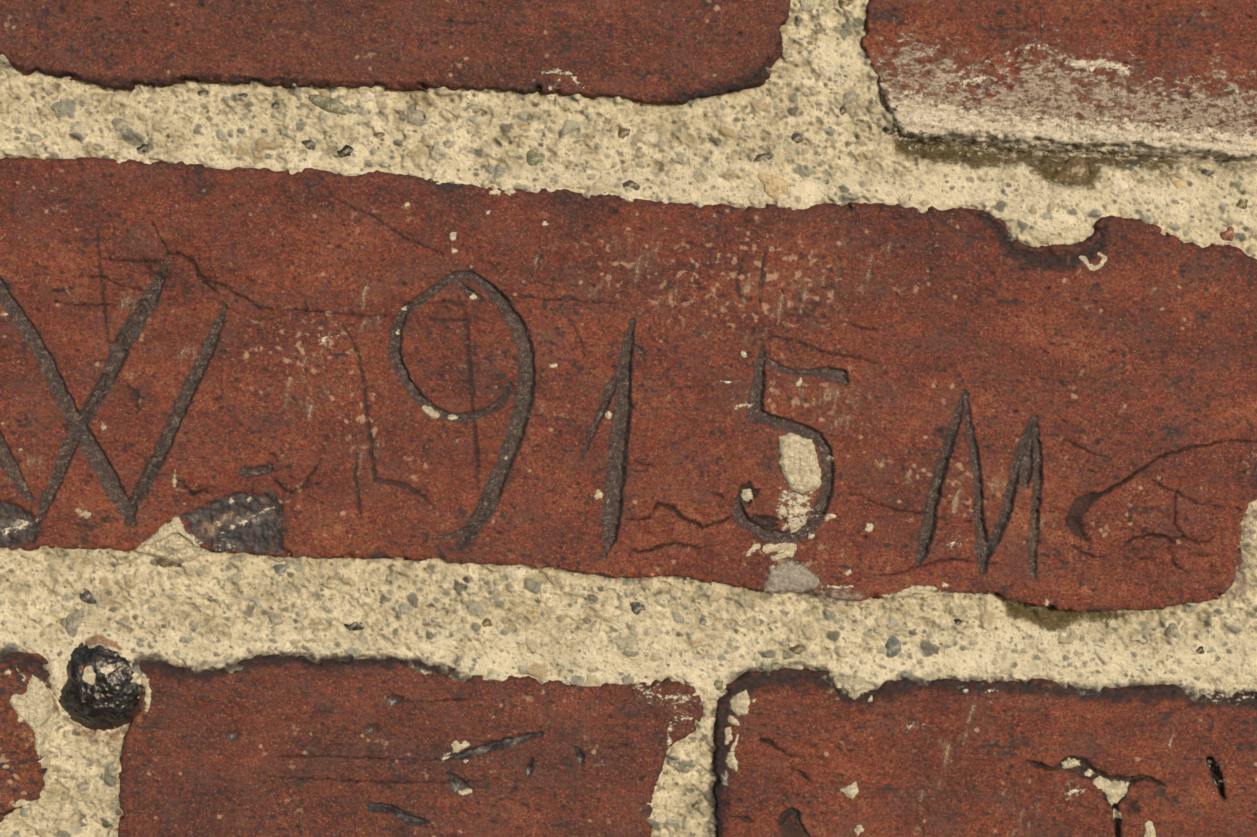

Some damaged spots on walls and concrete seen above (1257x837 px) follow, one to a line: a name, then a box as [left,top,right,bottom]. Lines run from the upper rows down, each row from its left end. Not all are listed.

damp [862,33,1257,190]
spalling [738,481,778,529]
crack [1064,440,1257,572]
spalling [1026,756,1163,837]